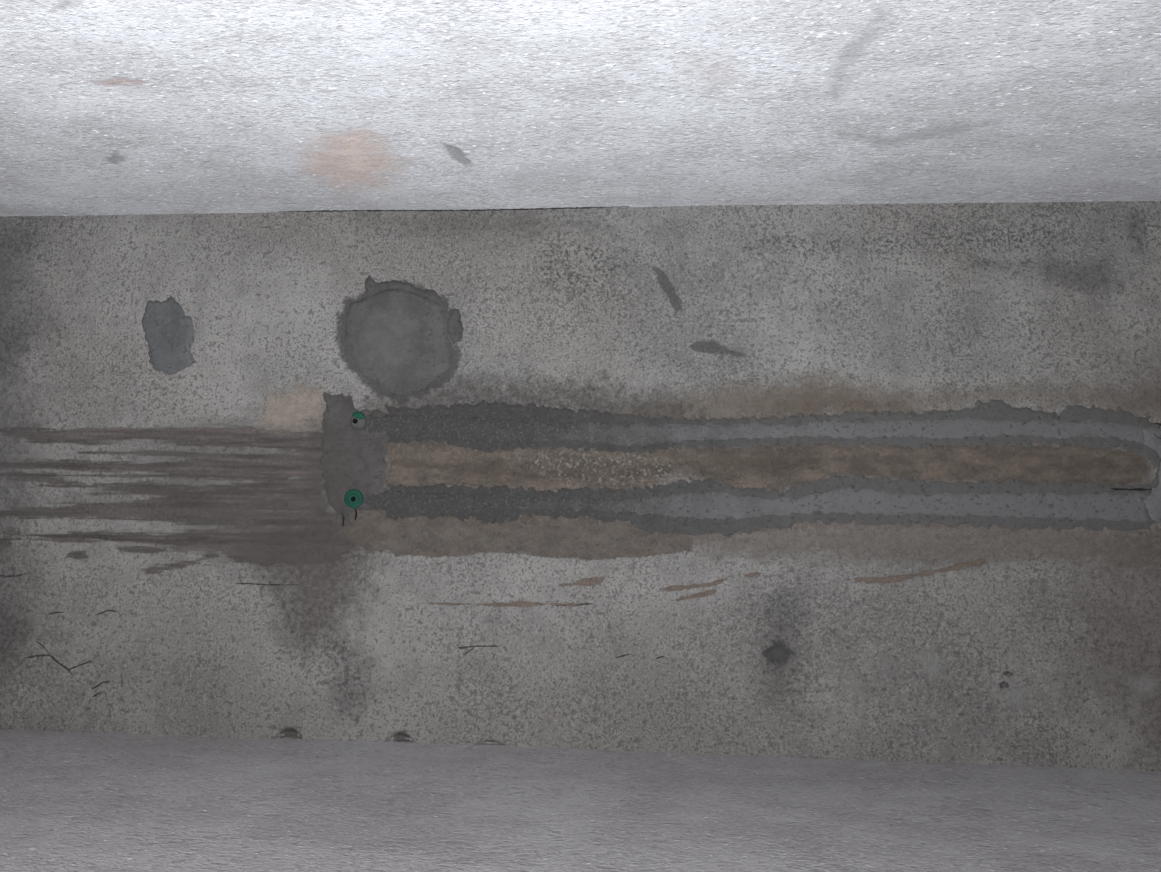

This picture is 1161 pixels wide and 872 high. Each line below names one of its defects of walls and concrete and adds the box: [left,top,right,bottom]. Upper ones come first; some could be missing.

rust [382,440,1150,494]
damp [0,427,367,647]
rust [345,509,1161,583]
rust [560,577,603,586]
rust [660,578,727,601]
crack [26,640,111,697]